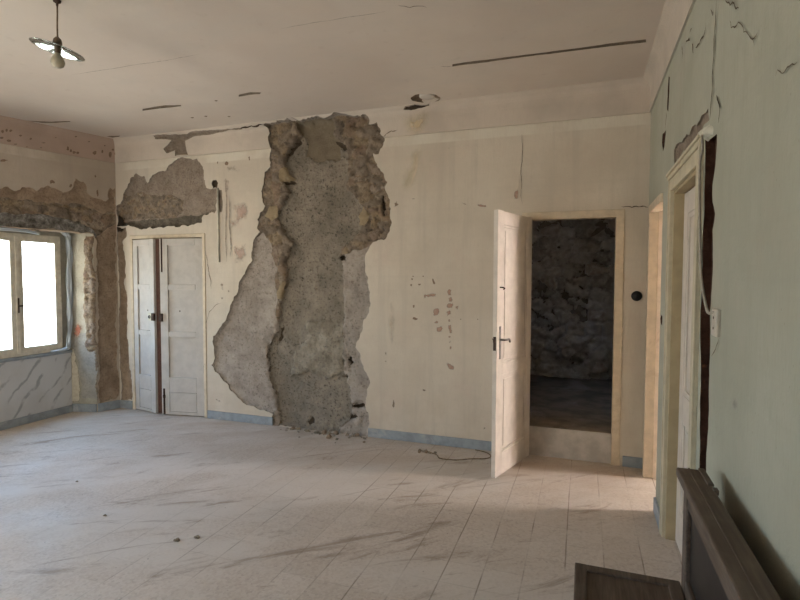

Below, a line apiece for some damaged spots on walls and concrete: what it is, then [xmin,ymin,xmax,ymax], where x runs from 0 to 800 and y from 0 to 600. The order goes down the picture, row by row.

crack [682,0,757,123]
spalling [676,113,709,161]
flaking render [0,157,218,403]
flaking render [213,115,398,436]
peeling [434,289,458,337]